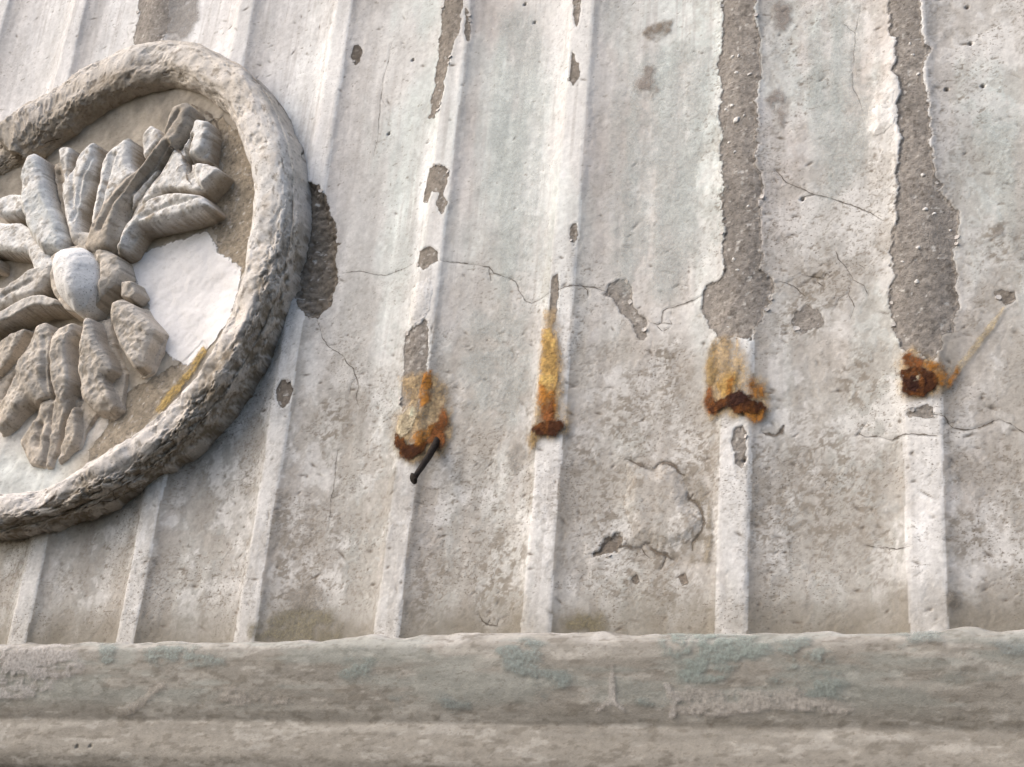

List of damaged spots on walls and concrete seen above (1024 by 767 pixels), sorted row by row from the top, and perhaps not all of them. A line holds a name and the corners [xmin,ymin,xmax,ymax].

spalling [428,0,471,119]
spalling [423,163,449,214]
spalling [702,0,774,342]
spalling [887,0,960,364]
spalling [295,182,341,319]
crack [445,261,598,303]
spalling [398,319,429,411]
rust [394,370,452,463]
rust [529,310,568,449]
rust [704,337,769,423]
rust [899,309,1003,397]
crack [619,459,705,567]